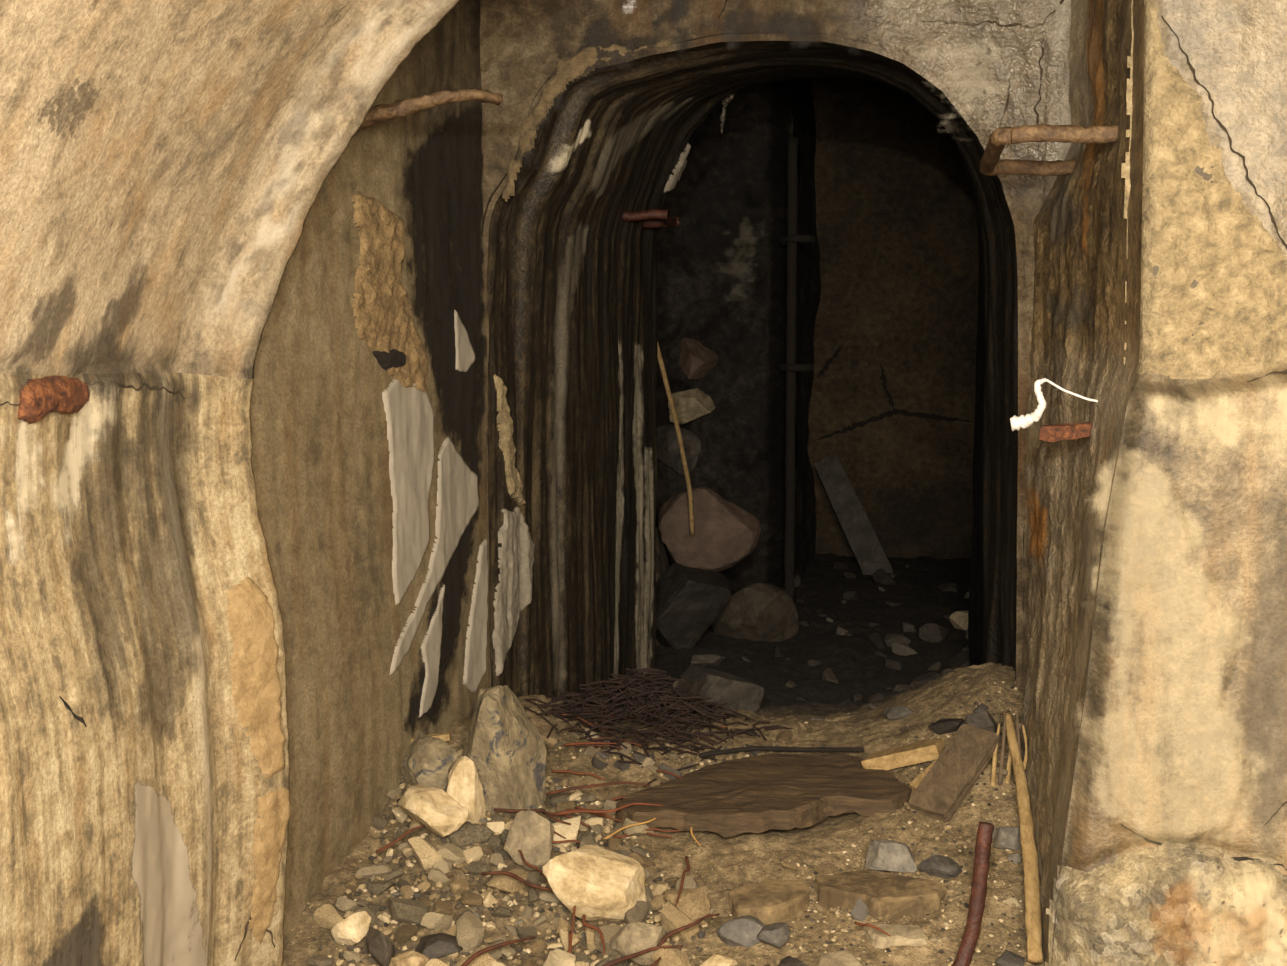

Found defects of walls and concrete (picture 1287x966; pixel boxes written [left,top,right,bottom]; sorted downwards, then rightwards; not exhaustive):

spalling [1121,0,1287,379]
crack [1162,16,1287,249]
crack [84,379,186,398]
peeling [351,191,479,718]
peeling [463,375,535,693]
crack [1247,369,1287,382]
crack [1121,824,1163,845]
crack [1231,857,1287,870]